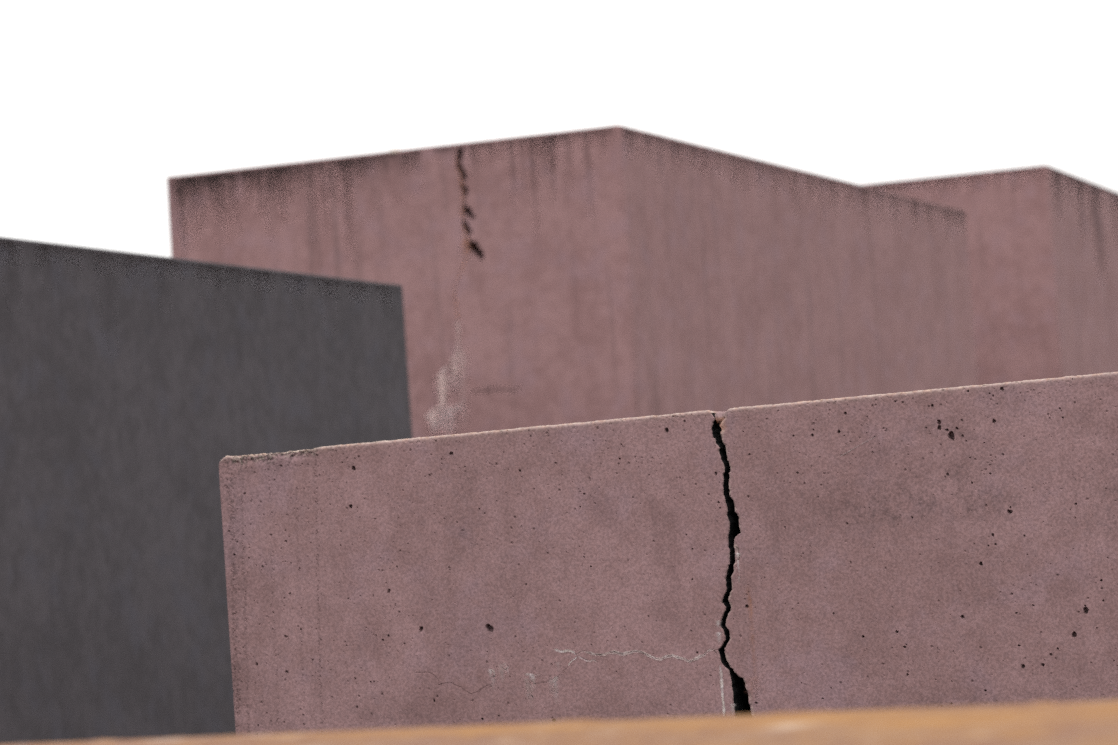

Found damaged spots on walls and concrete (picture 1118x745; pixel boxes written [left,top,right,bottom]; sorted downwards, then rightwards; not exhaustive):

crack [455,147,484,261]
crack [556,411,756,715]